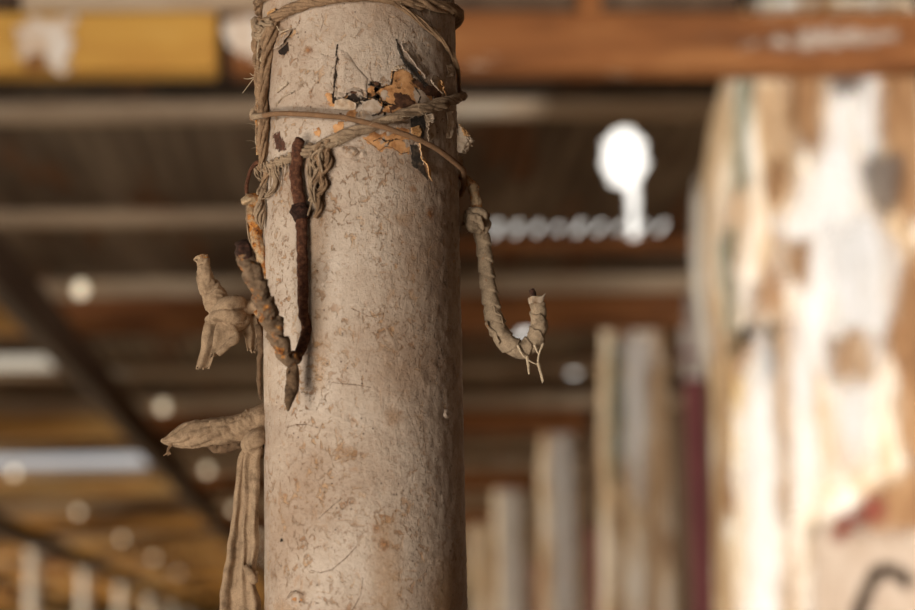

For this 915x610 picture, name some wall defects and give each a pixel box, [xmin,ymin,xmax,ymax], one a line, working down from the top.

crack [315,44,374,104]
peeling [324,39,455,133]
peeling [363,111,475,183]